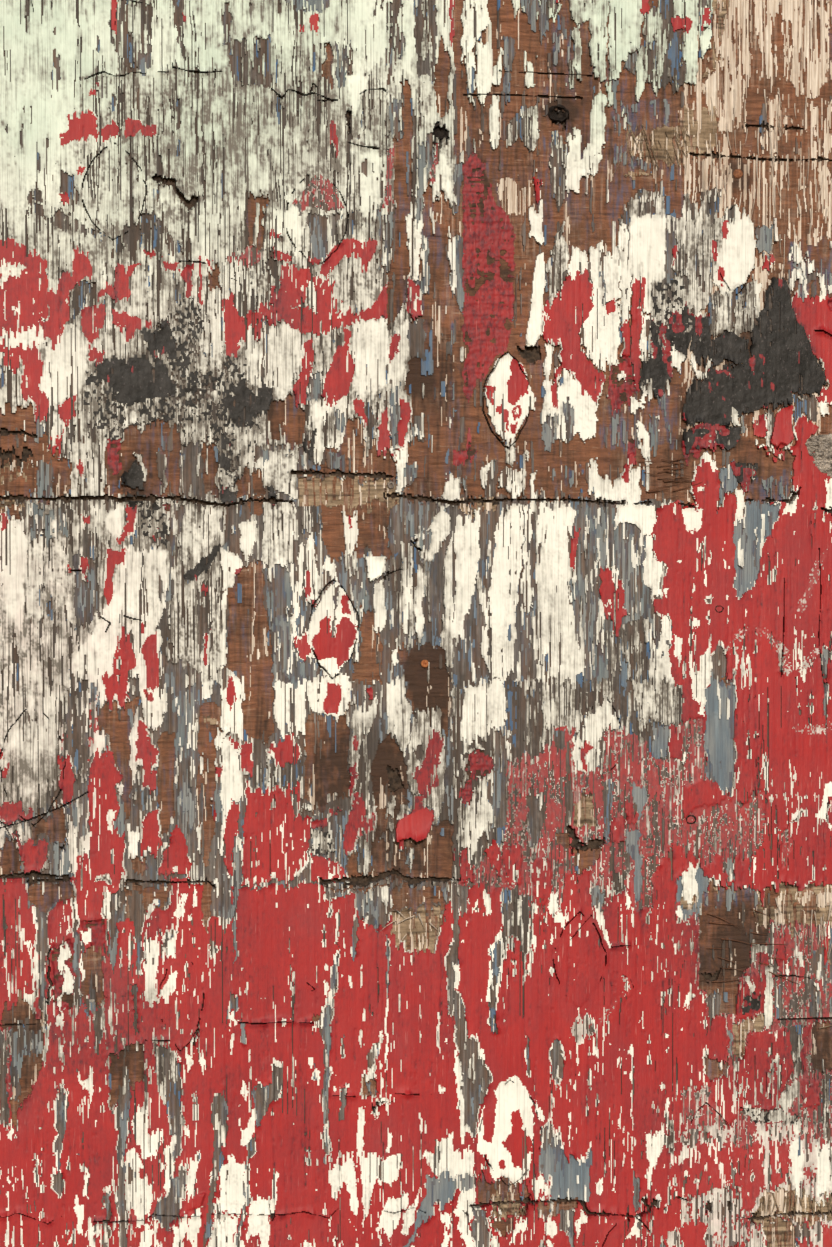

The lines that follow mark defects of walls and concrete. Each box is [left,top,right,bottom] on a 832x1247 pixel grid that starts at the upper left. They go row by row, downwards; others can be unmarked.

peeling [291,0,832,712]
crack [0,469,693,508]
crack [745,491,832,514]
peeling [226,556,277,744]
peeling [96,684,141,837]
peeling [303,633,458,885]
crack [0,870,70,886]
crack [125,878,215,889]
crack [318,868,459,888]
peeling [694,881,832,1010]
peeling [403,1139,592,1247]
crack [470,1196,686,1219]